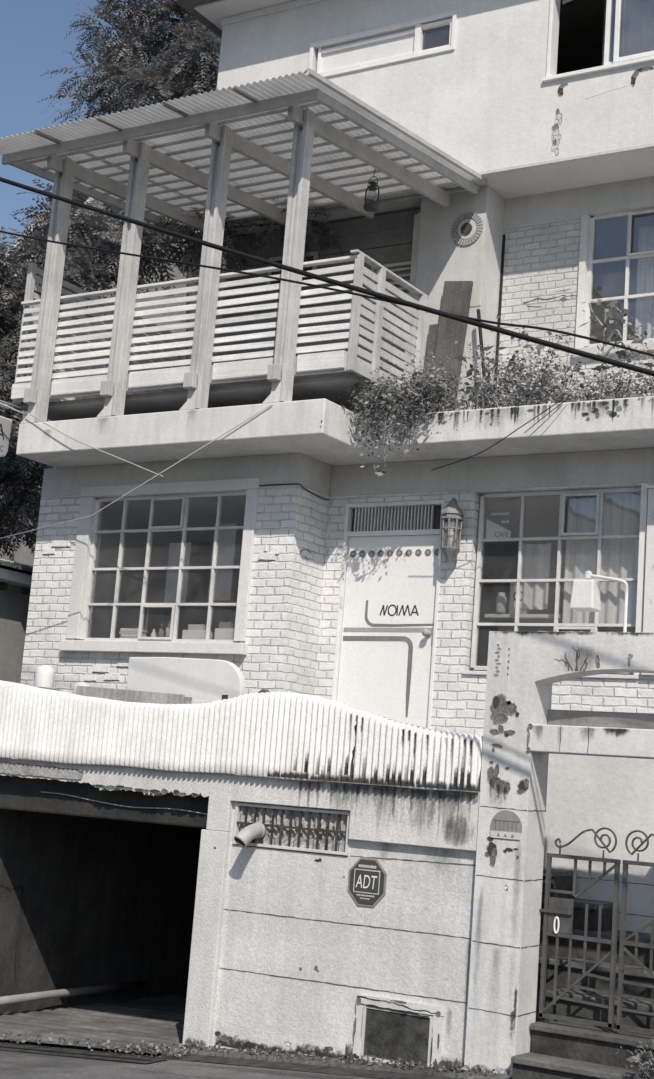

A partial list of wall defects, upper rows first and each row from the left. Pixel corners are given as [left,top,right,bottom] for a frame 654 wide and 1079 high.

peeling [551,83,568,156]
leakage [418,407,519,423]
leakage [534,399,627,419]
peeling [487,693,533,794]
spalling [94,784,198,797]
leakage [267,756,506,841]
peeling [485,836,519,867]